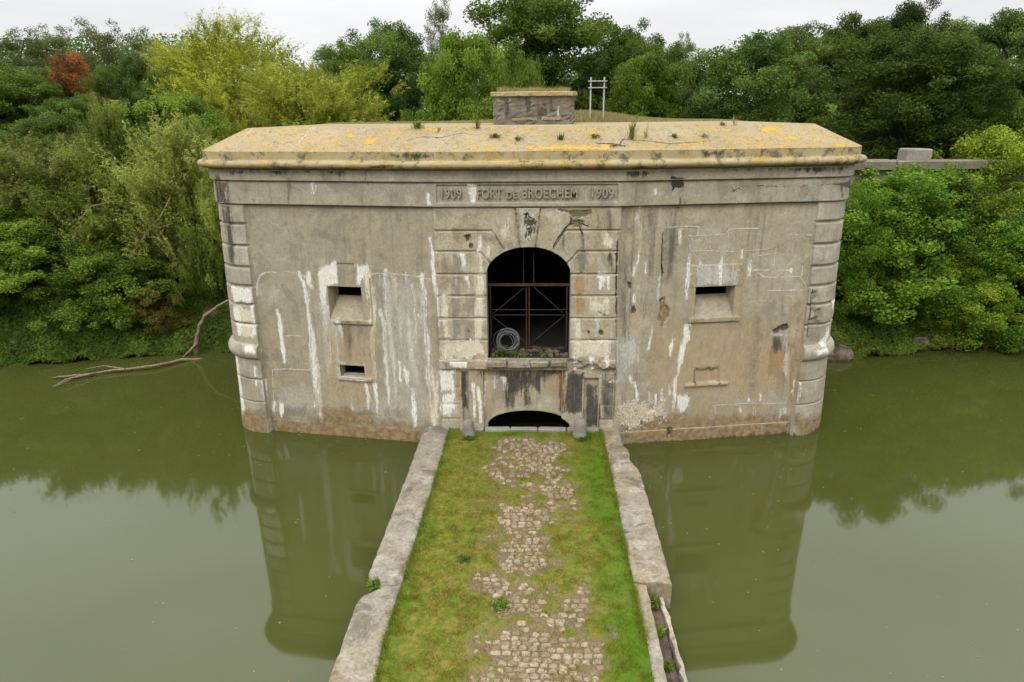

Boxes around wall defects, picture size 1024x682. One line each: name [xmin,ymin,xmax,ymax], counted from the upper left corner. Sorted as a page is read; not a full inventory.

spalling [524,212,537,238]
crack [553,218,589,247]
leakage [231,285,284,418]
leakage [276,309,287,363]
leakage [298,184,555,429]
spalling [657,297,670,327]
leakage [564,220,801,427]
peeling [604,398,673,437]